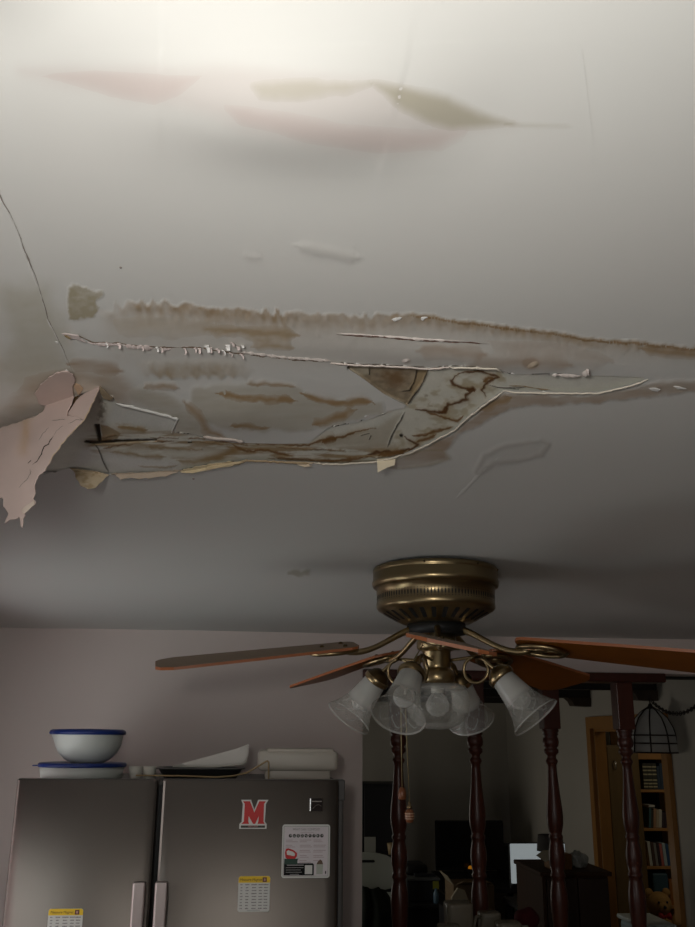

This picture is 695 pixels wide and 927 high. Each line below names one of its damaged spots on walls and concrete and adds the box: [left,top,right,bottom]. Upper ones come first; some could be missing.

peeling [0,371,113,528]
crack [0,195,334,372]
leakage [0,269,695,472]
crack [360,367,429,448]
crack [337,333,481,344]